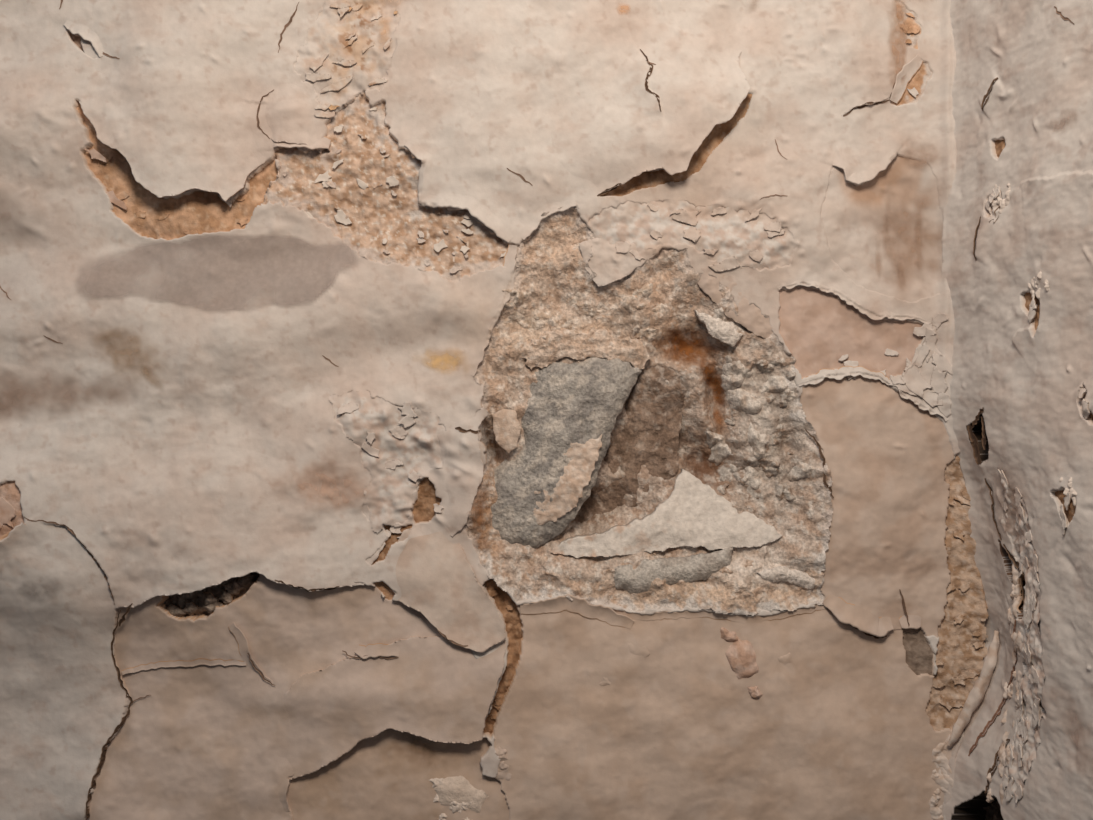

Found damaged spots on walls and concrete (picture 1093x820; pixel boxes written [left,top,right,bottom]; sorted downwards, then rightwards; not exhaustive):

crack [640,49,661,112]
spalling [77,0,945,616]
rust [671,334,724,423]
crack [275,580,340,592]
peeling [87,313,1000,820]
crack [24,517,151,820]
crack [247,653,275,686]
crack [343,651,399,659]
crack [436,628,468,647]
crack [484,579,522,734]
peeling [983,554,1039,820]